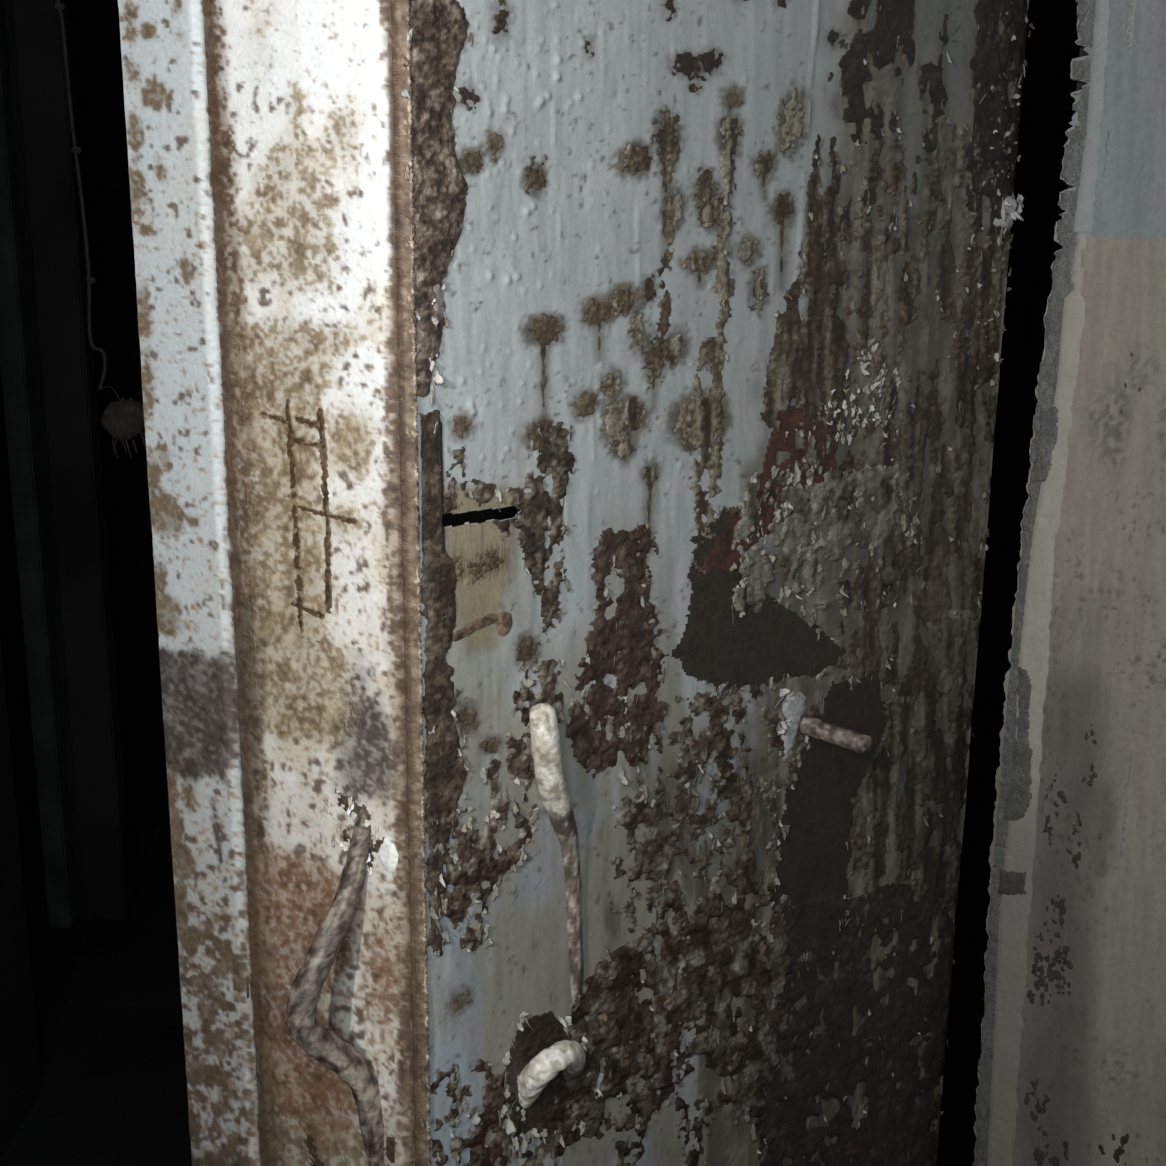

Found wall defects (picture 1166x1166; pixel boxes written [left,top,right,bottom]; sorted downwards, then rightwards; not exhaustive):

rust [122,3,156,41]
rust [125,60,173,236]
rust [137,293,153,337]
peeling [431,284,445,330]
rust [141,354,154,422]
peeling [429,358,445,407]
peeling [672,406,926,964]